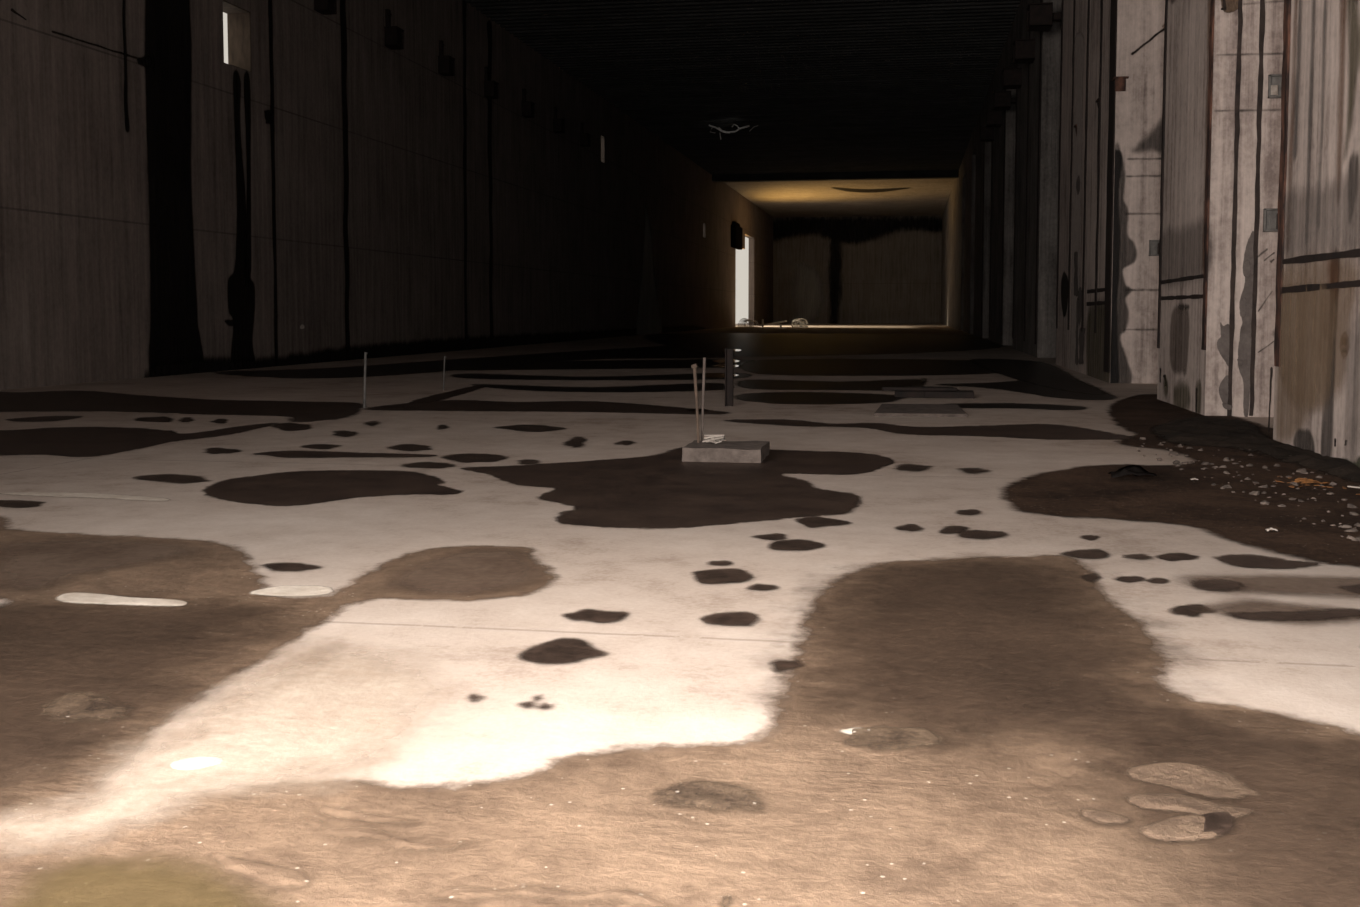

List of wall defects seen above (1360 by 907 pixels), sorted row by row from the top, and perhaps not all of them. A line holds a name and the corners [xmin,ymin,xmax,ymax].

leakage [122,0,705,378]
leakage [0,122,1360,623]
leakage [1293,0,1326,243]
leakage [1347,0,1360,135]
leakage [0,517,1360,907]